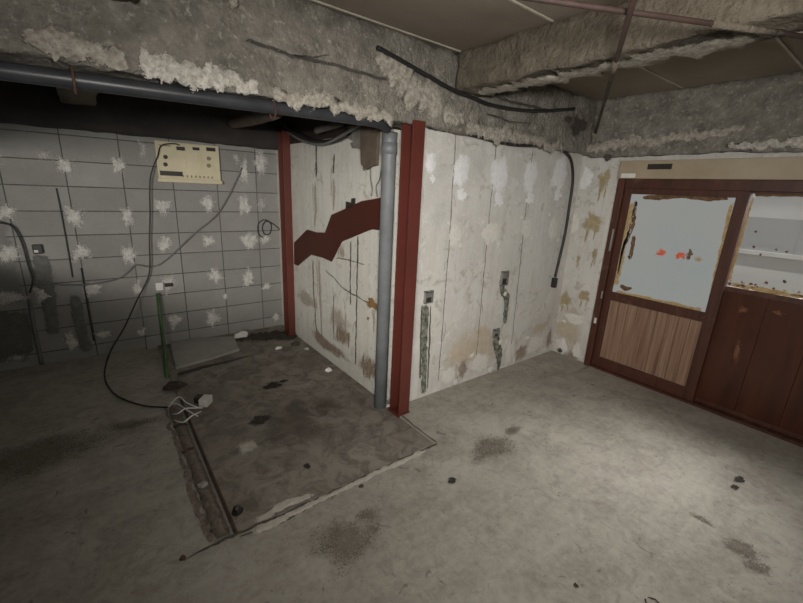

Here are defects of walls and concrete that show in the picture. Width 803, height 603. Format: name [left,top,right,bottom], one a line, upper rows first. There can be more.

spalling [19,23,261,96]
spalling [478,35,758,96]
spalling [272,84,394,126]
spalling [374,52,563,154]